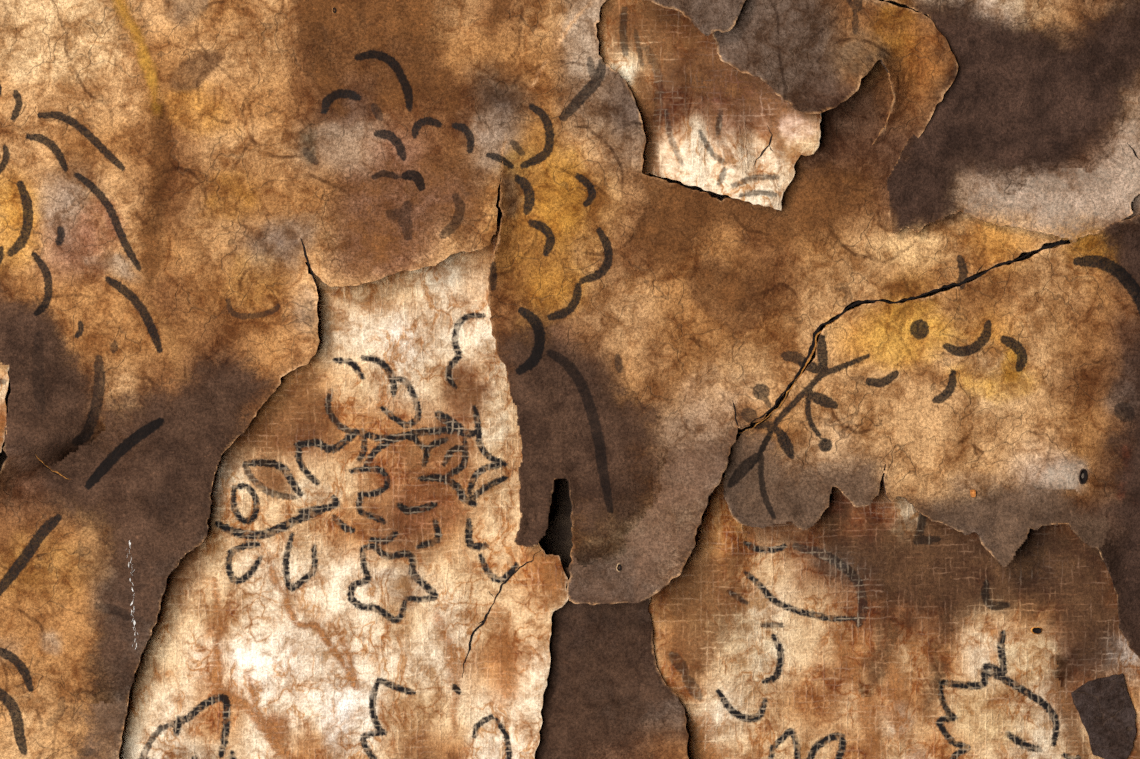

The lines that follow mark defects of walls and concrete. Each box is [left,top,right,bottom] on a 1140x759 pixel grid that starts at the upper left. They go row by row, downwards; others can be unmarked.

water stain [887,4,1140,229]
crack [732,238,1067,431]
water stain [0,303,322,679]